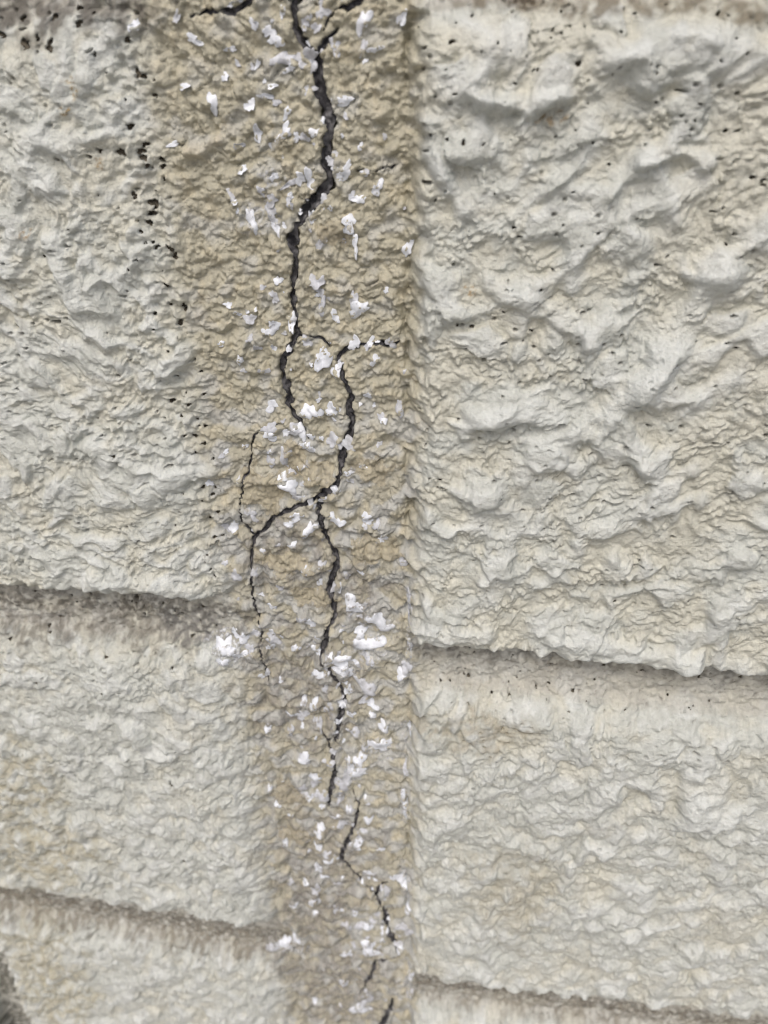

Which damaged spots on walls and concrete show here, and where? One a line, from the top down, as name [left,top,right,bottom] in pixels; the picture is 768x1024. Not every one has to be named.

crack [191,0,252,18]
crack [239,0,400,993]
crack [379,998,394,1024]